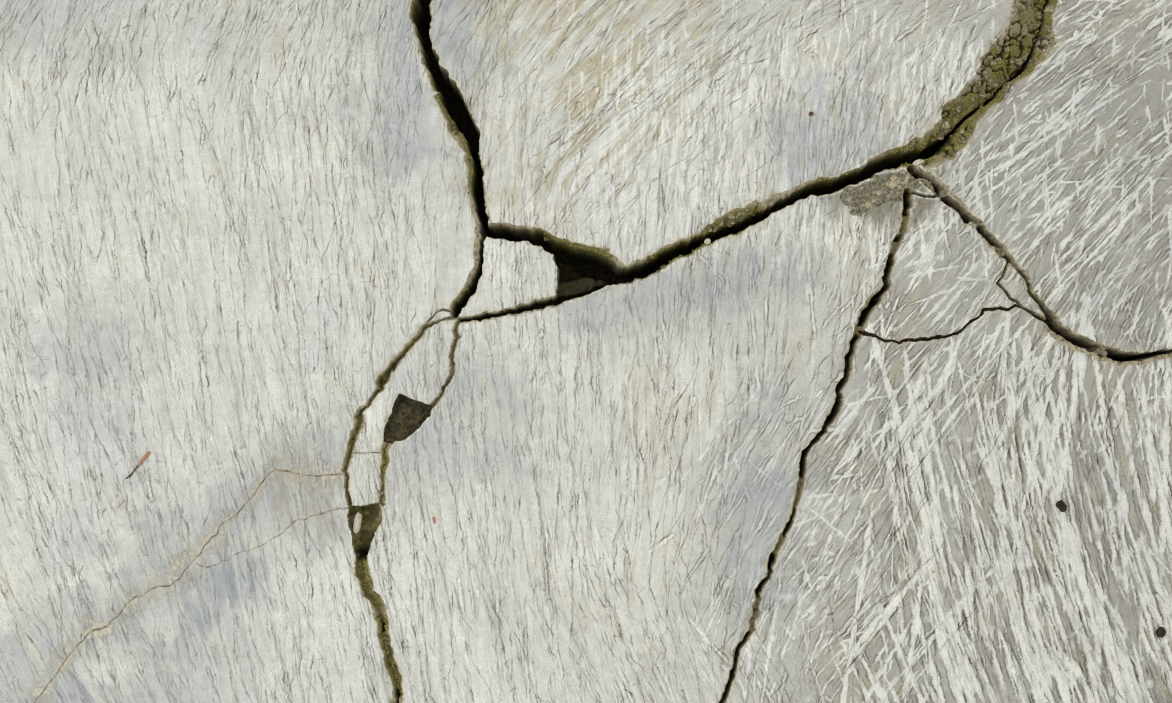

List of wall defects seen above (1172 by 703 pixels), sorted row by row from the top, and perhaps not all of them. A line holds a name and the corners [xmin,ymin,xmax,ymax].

crack [34,0,562,703]
crack [487,0,1172,703]